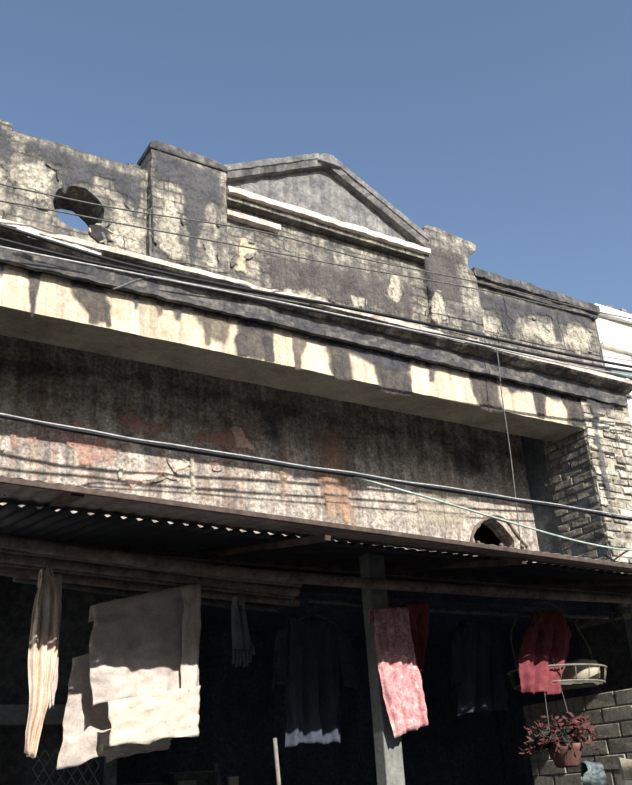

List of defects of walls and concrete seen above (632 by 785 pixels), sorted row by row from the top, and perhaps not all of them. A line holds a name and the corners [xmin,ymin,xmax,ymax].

damp [0,130,141,226]
damp [155,151,219,268]
damp [24,268,42,316]
damp [71,279,112,325]
damp [155,298,435,396]
damp [263,256,413,316]
flaking render [383,275,405,302]
flaking render [429,290,446,324]
flaking render [483,318,500,343]
damp [479,291,591,342]
flaking render [522,317,593,354]